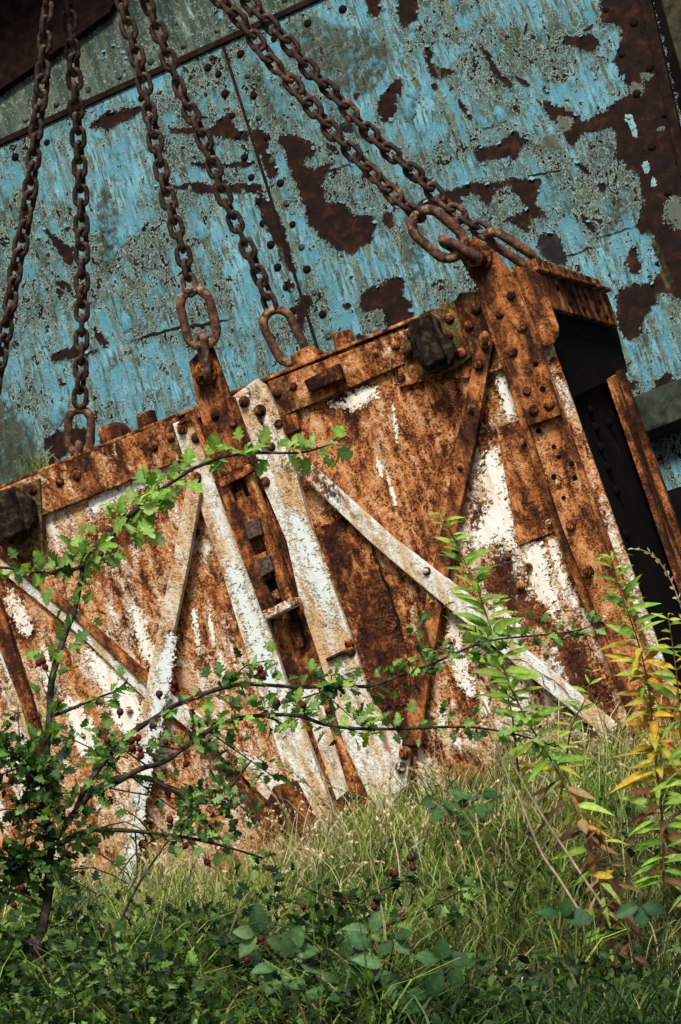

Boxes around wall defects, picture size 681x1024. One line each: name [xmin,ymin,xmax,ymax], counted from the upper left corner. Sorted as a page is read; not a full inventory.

peeling [151,111,397,333]
peeling [416,126,569,268]
peeling [479,0,681,342]
peeling [342,274,416,329]
peeling [326,385,381,413]
rust [86,502,170,597]
rust [283,445,356,517]
rust [463,493,491,539]
peeling [464,445,572,627]
rust [340,568,413,764]
rust [473,538,617,711]
rust [187,740,288,853]